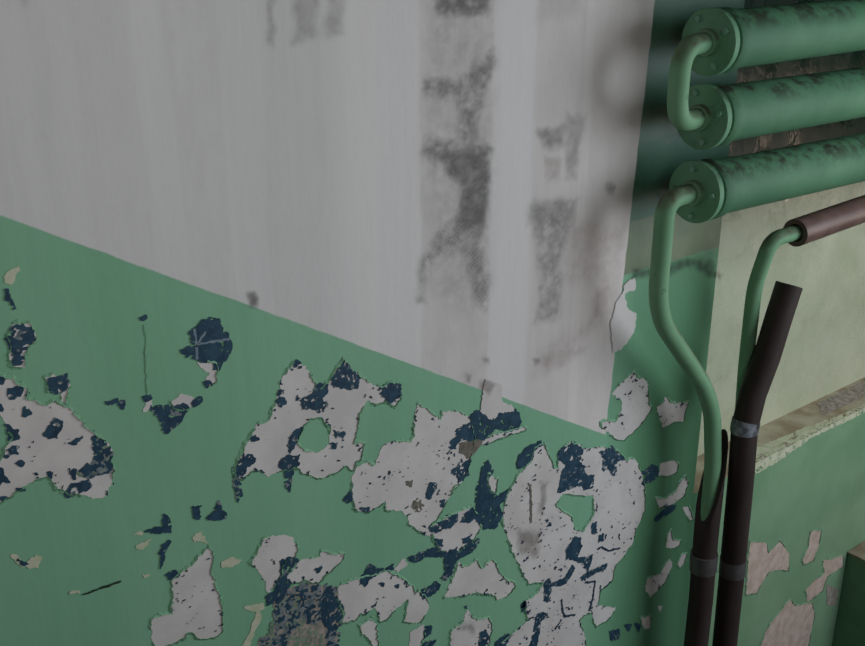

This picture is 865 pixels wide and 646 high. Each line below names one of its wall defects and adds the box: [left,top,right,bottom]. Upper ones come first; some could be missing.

peeling [610,278,637,352]
peeling [0,265,116,505]
peeling [105,398,126,410]
peeling [142,317,233,434]
peeling [133,357,695,646]
peeling [11,554,42,569]
peeling [744,539,790,596]
peeling [759,528,844,646]